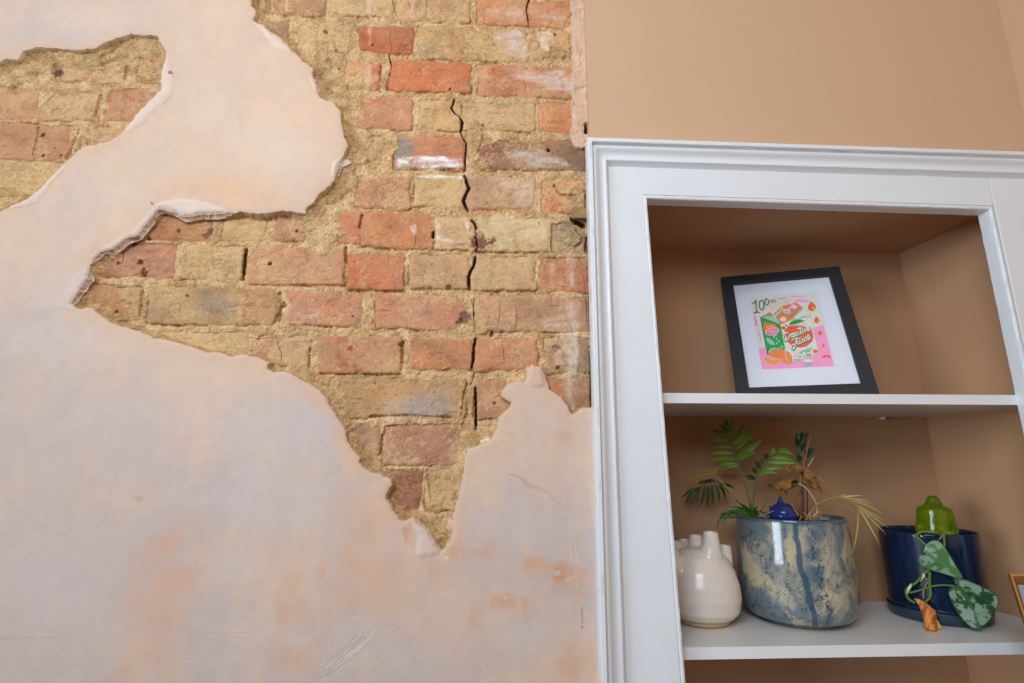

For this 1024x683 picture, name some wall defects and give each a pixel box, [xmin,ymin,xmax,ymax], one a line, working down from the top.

flaking render [0,34,175,212]
flaking render [57,0,591,558]
crack [451,100,517,421]